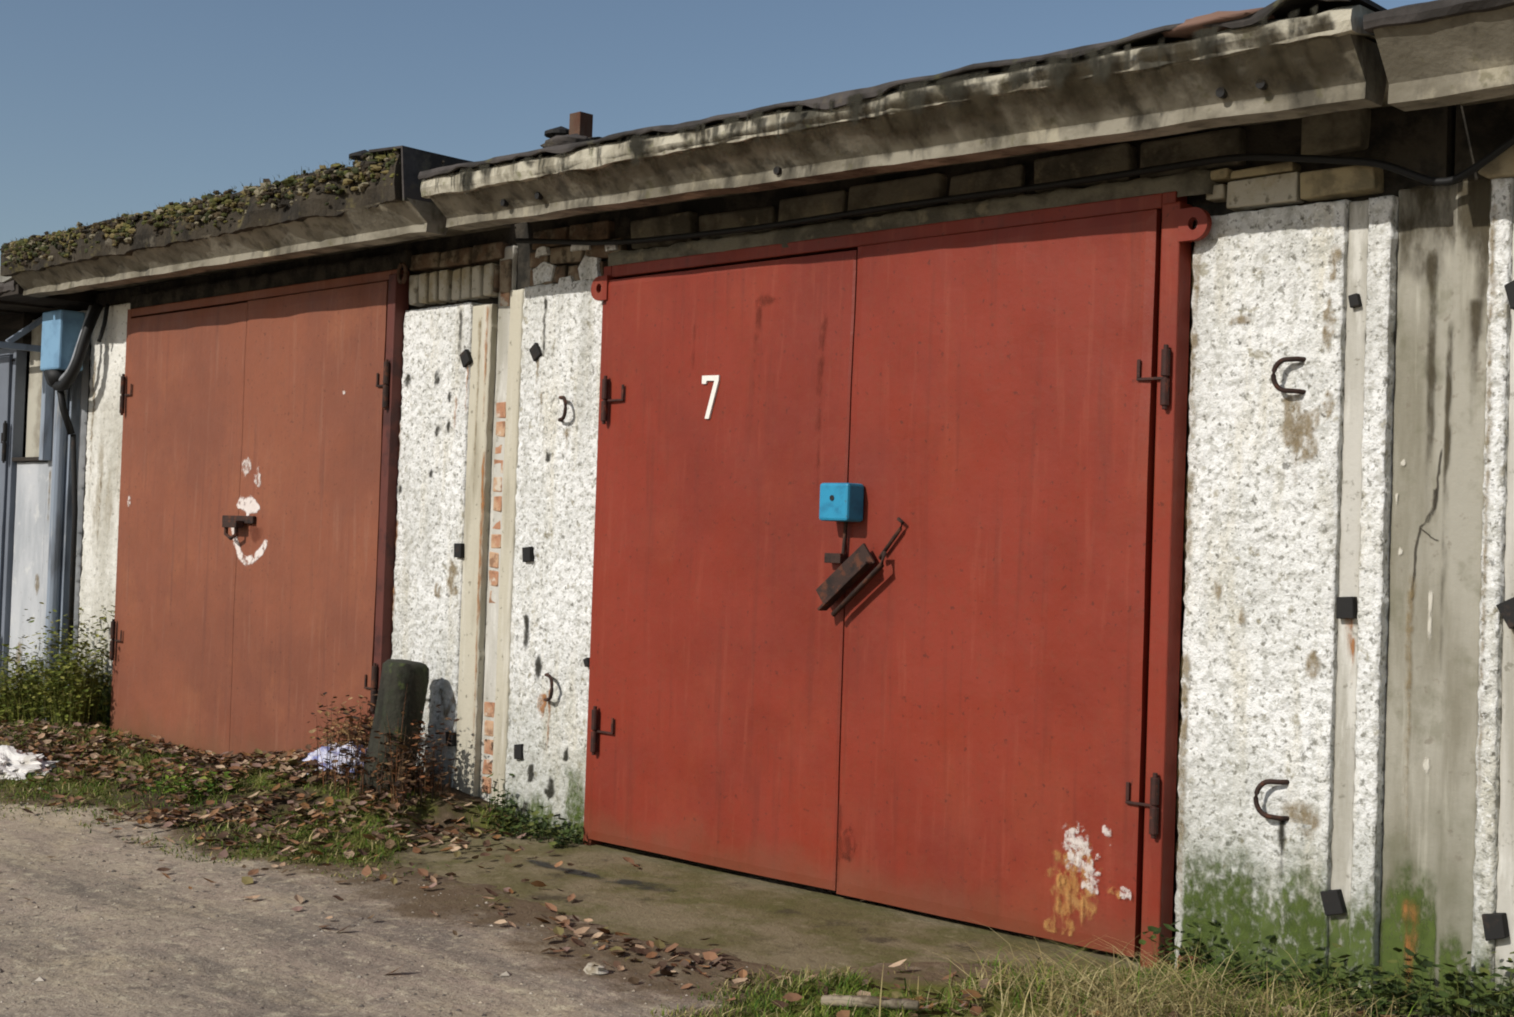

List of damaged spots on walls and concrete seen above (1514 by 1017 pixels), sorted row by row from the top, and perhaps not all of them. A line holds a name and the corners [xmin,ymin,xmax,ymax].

water stain [513,5,1341,183]
water stain [430,163,489,199]
water stain [1400,177,1490,344]
water stain [1427,319,1451,482]
crack [1411,451,1442,600]
water stain [1406,590,1432,635]
peeling [1044,828,1099,936]
water stain [1187,878,1253,963]
water stain [1284,901,1324,981]